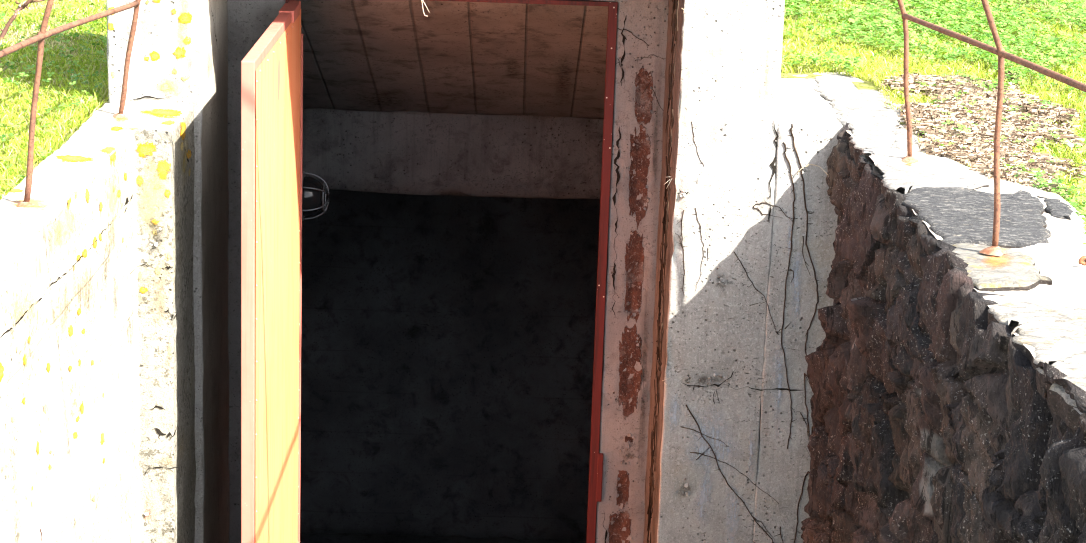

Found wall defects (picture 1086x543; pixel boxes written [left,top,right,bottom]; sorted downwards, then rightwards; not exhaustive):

crack [0,194,133,338]
crack [683,365,801,404]